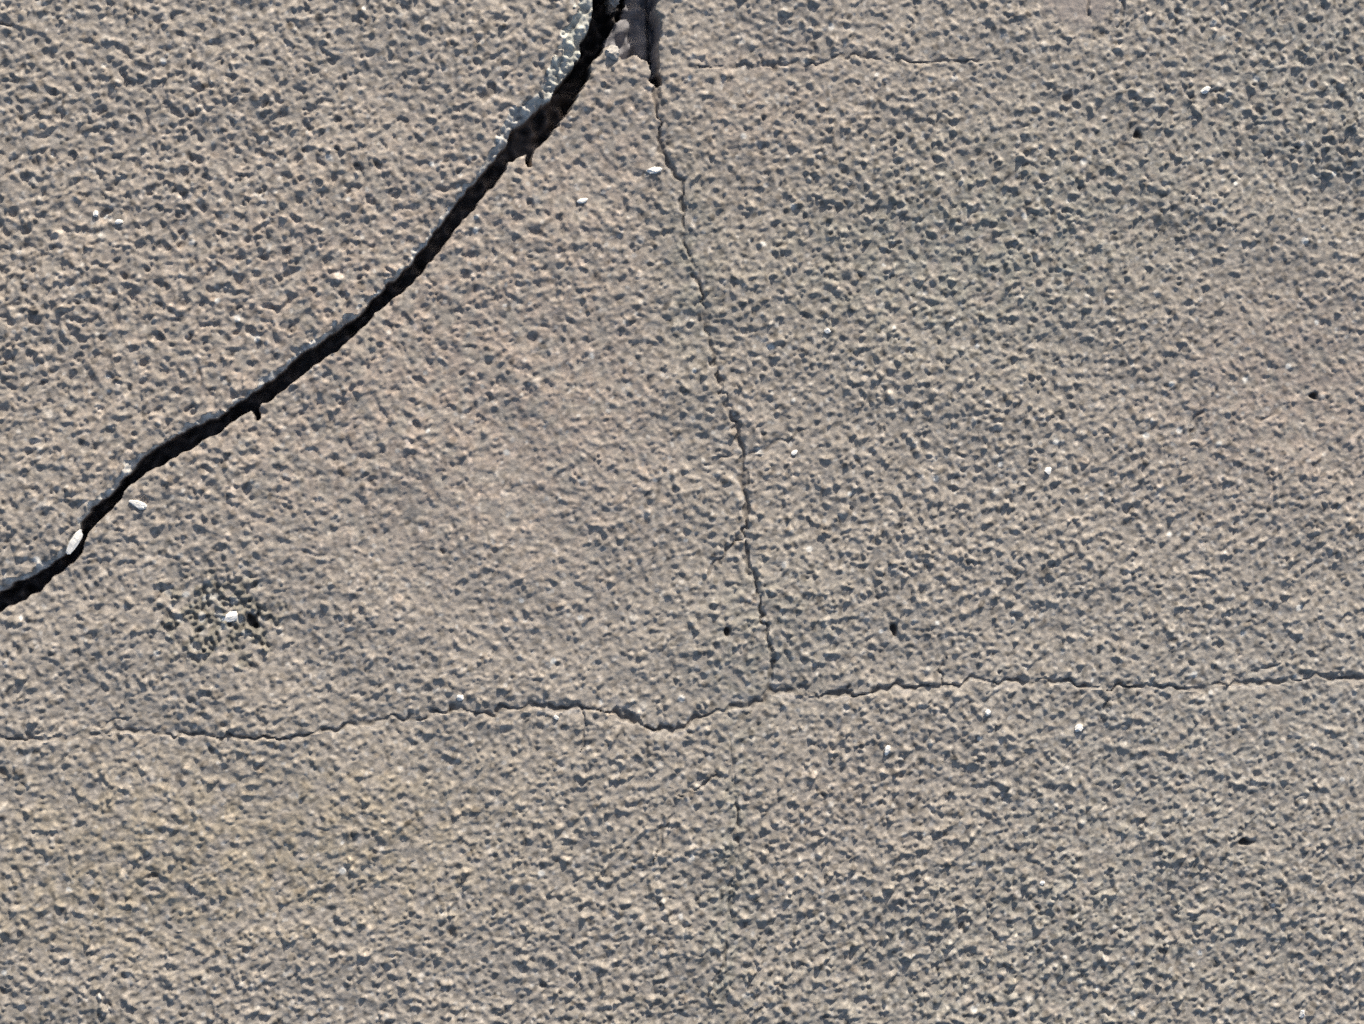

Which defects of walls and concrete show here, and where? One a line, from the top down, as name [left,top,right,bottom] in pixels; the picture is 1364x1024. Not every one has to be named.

crack [0,0,1364,778]
crack [652,774,716,864]
crack [722,782,743,932]
crack [702,937,729,1013]